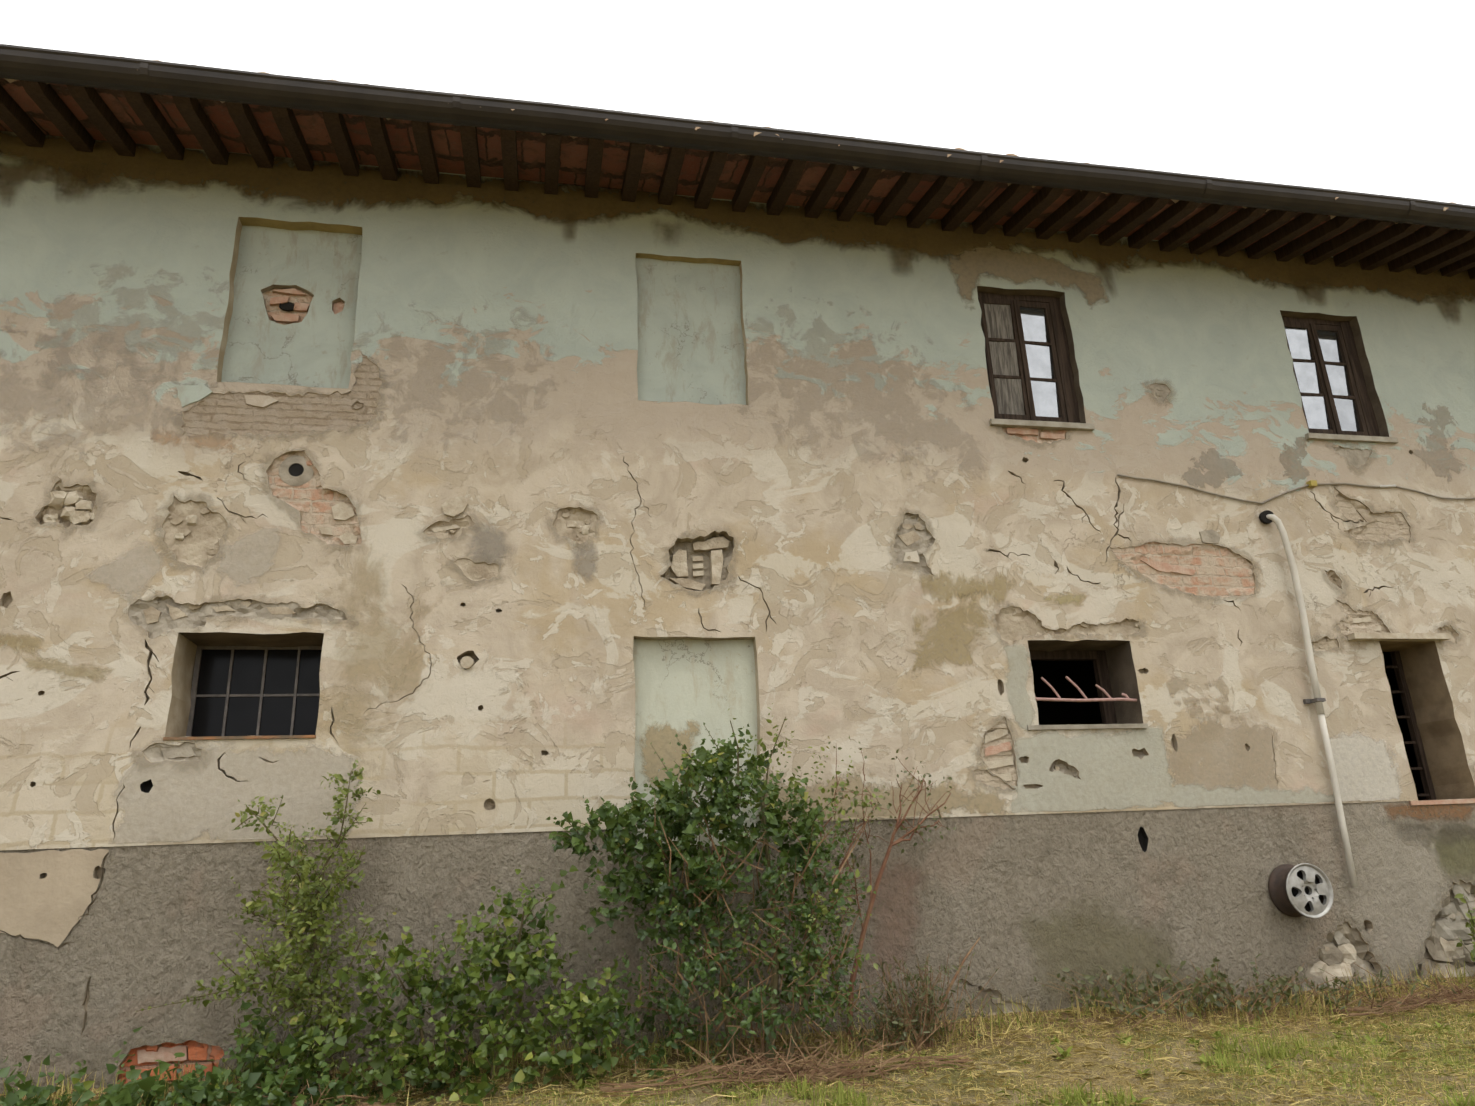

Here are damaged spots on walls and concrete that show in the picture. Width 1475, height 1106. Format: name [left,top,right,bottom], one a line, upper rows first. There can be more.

spalling [261,284,314,325]
spalling [176,354,382,545]
spalling [35,480,97,529]
crack [623,458,651,607]
spalling [661,531,735,592]
crack [986,471,1131,584]
spalling [128,595,349,639]
crack [130,639,159,746]
crack [0,784,125,949]
crack [81,977,91,1035]
spalling [1301,920,1382,991]
spalling [1408,879,1475,981]